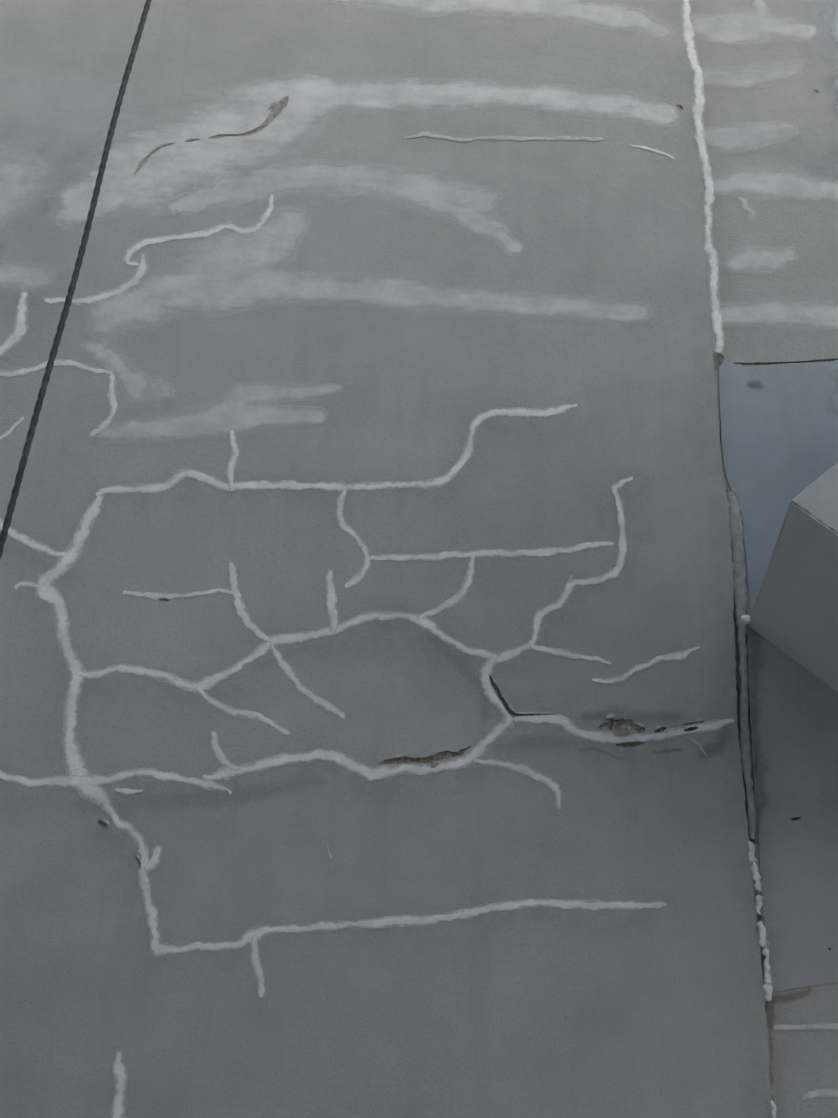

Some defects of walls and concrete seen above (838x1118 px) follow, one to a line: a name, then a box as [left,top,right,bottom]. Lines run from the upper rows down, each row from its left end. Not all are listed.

crack [135,97,289,174]
crack [403,131,604,142]
crack [630,145,674,159]
crack [0,195,274,436]
crack [733,358,838,366]
crack [0,404,735,998]
crack [112,1051,126,1118]